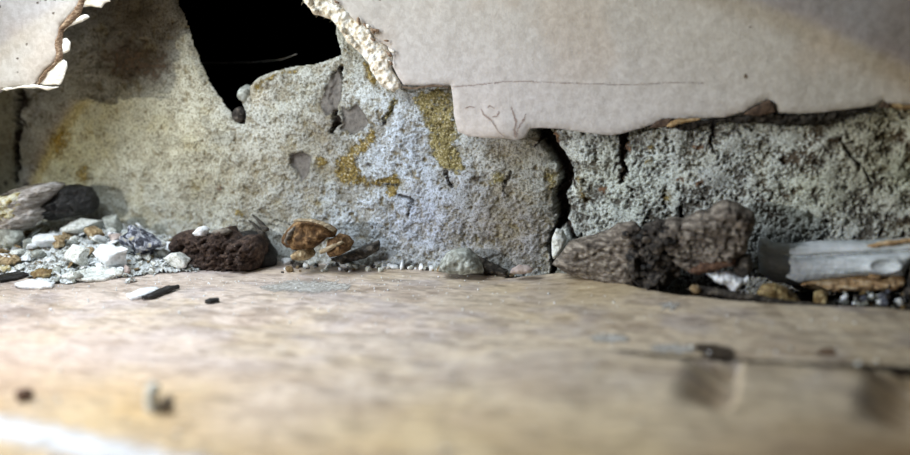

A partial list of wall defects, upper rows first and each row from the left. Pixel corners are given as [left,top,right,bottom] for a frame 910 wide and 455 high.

spalling [178,0,401,135]
crack [402,83,449,91]
spalling [290,153,311,181]
crack [466,106,579,274]
peeling [14,265,124,290]